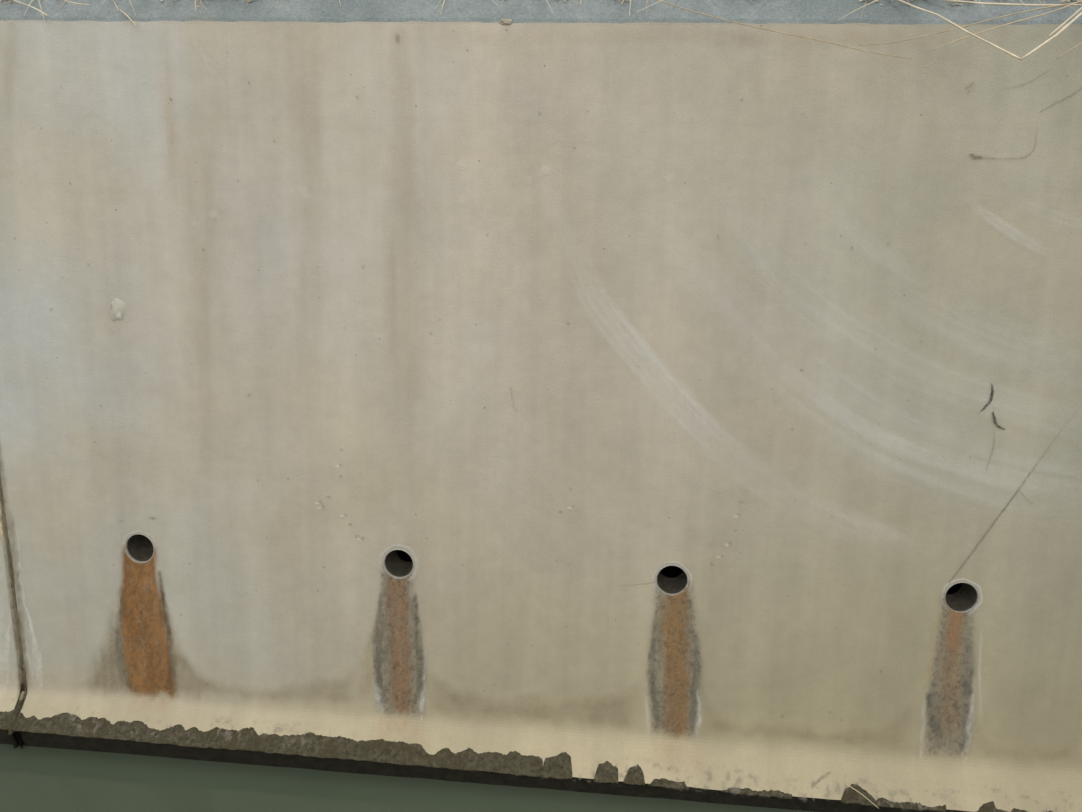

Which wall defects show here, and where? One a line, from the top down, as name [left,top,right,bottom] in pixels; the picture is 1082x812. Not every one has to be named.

leakage [0,488,27,705]
rust [96,549,176,695]
rust [375,573,423,713]
rust [649,589,700,734]
spalling [0,708,572,779]
spalling [594,761,688,789]
spalling [721,787,792,799]
spalling [841,783,947,812]
spalling [976,801,1028,812]